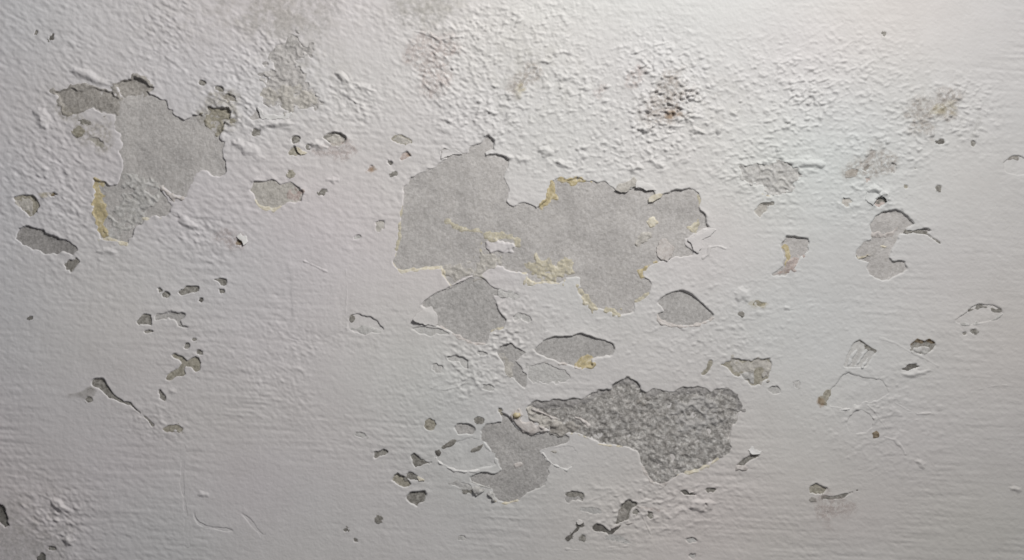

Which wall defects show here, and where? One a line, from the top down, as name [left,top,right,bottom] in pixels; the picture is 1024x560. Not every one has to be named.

peeling [14,195,80,272]
peeling [49,73,236,246]
peeling [137,312,203,401]
peeling [158,286,203,302]
peeling [250,170,327,213]
peeling [388,134,716,388]
peeling [772,237,809,276]
peeling [845,150,929,280]
peeling [956,304,1003,335]
peeling [392,354,780,506]
peeling [809,483,826,502]